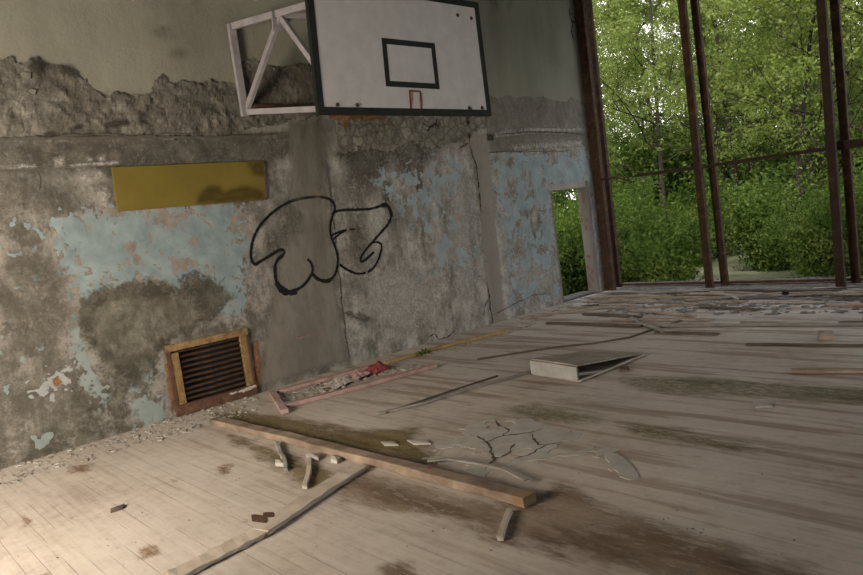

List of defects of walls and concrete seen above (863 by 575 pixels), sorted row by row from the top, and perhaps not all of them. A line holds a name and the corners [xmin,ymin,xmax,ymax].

spalling [0,56,319,142]
spalling [486,95,588,141]
peeling [0,202,258,318]
peeling [370,152,482,281]
peeling [490,148,603,310]
peeling [21,314,175,431]
damp [0,270,232,469]
peeling [31,432,54,450]
crack [471,421,555,470]